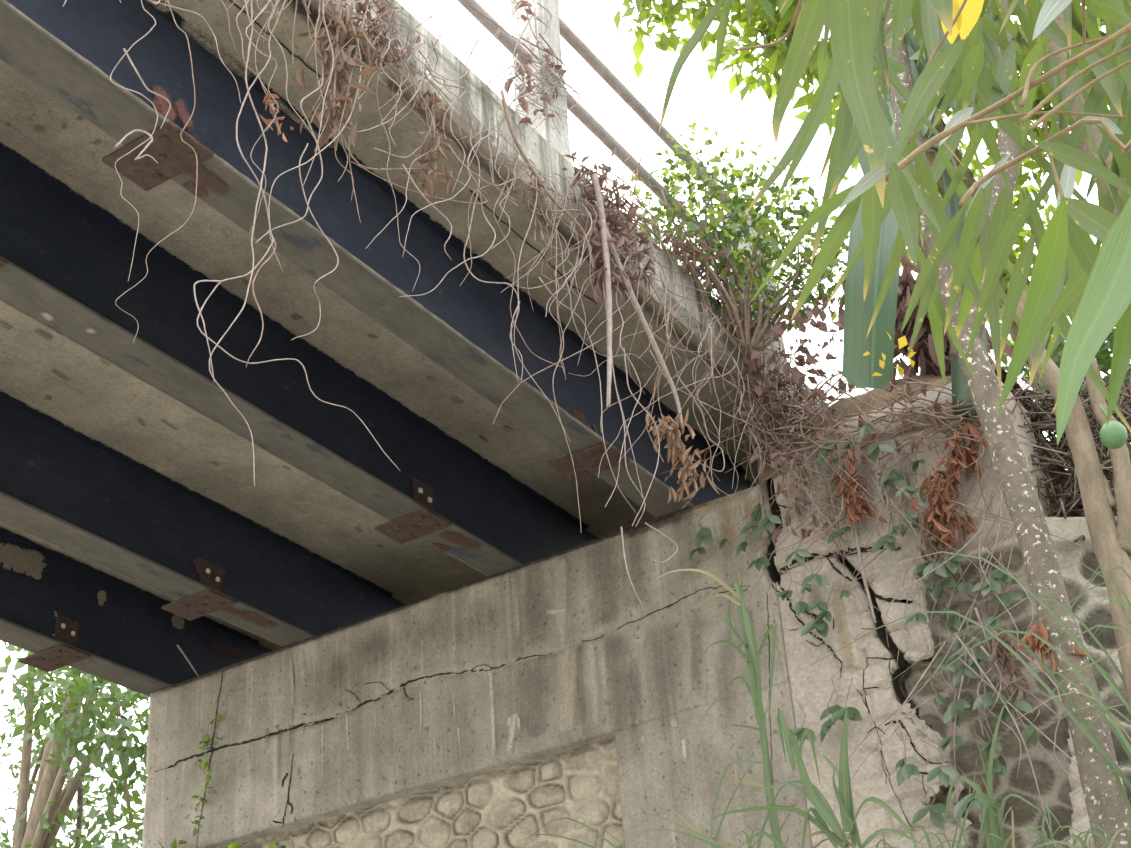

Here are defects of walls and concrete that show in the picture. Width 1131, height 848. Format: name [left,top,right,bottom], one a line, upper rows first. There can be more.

crack [229,0,321,77]
corrosion [153,86,194,129]
corrosion [184,166,226,198]
peeling [0,520,179,600]
peeling [97,590,107,606]
damp [448,503,706,624]
damp [171,598,427,700]
crack [155,456,941,848]